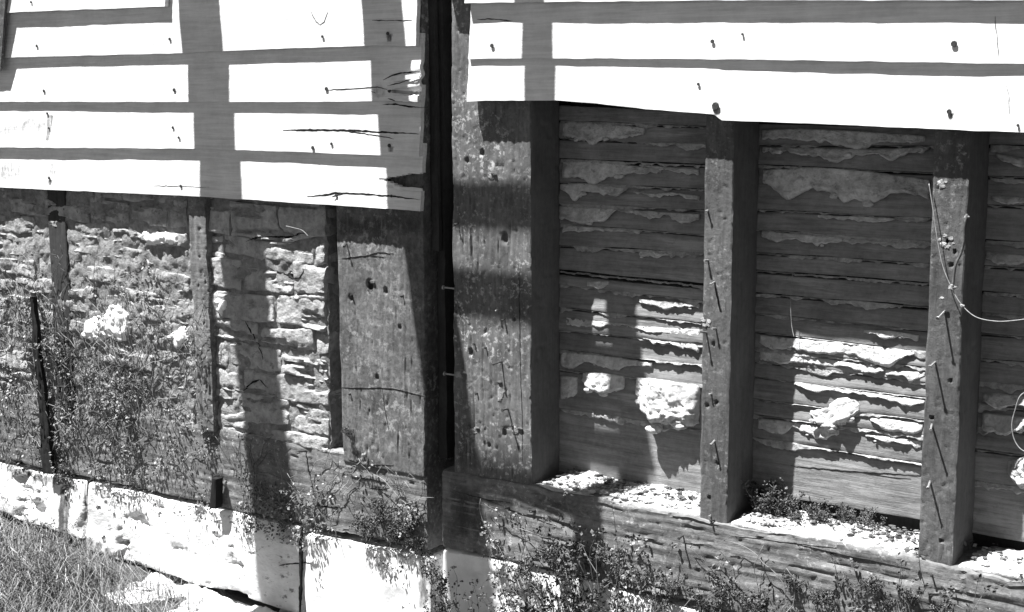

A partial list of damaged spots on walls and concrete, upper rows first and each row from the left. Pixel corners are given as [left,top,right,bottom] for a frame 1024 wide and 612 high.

crack [286,71,428,139]
crack [312,192,418,200]